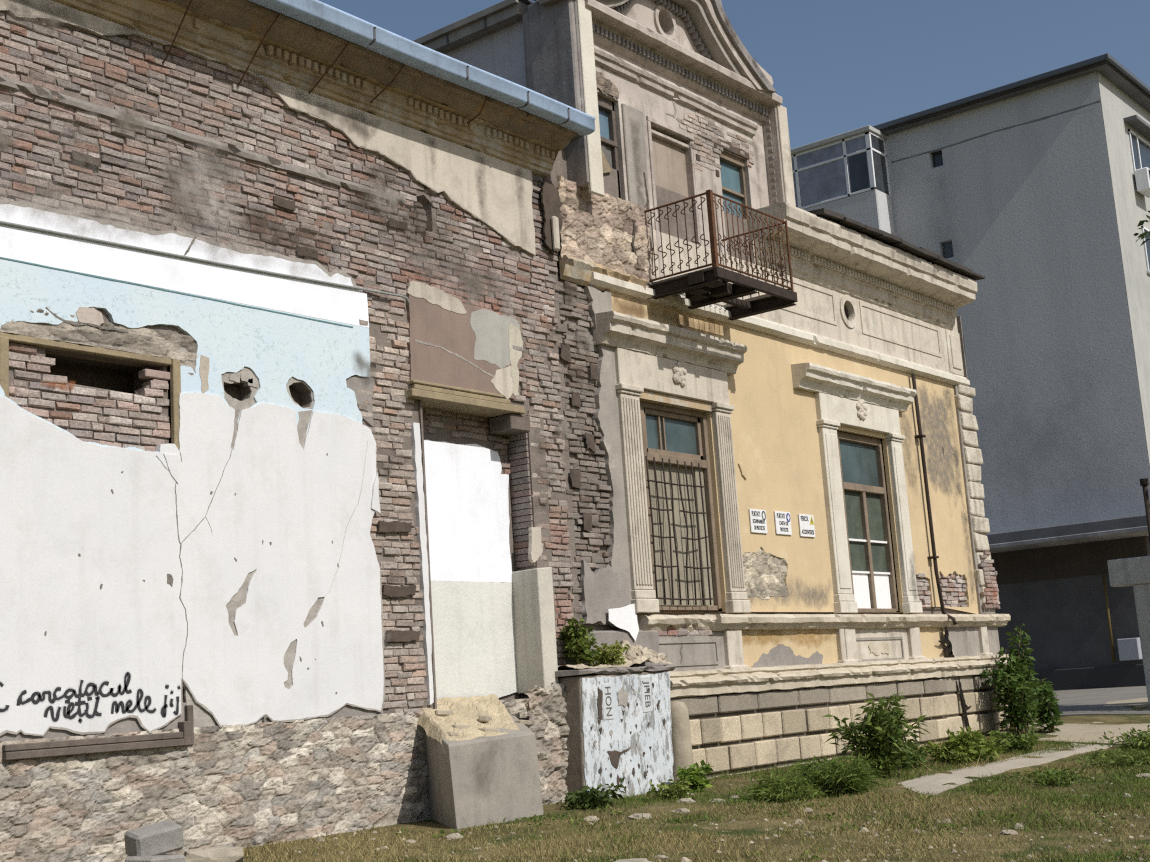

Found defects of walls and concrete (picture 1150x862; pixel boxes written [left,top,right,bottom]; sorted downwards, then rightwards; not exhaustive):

spalling [0,8,612,736]
water stain [920,392,959,491]
crack [156,448,233,679]
spalling [742,548,788,599]
spalling [916,572,967,609]
spalling [978,551,1000,609]
peeling [591,681,666,792]